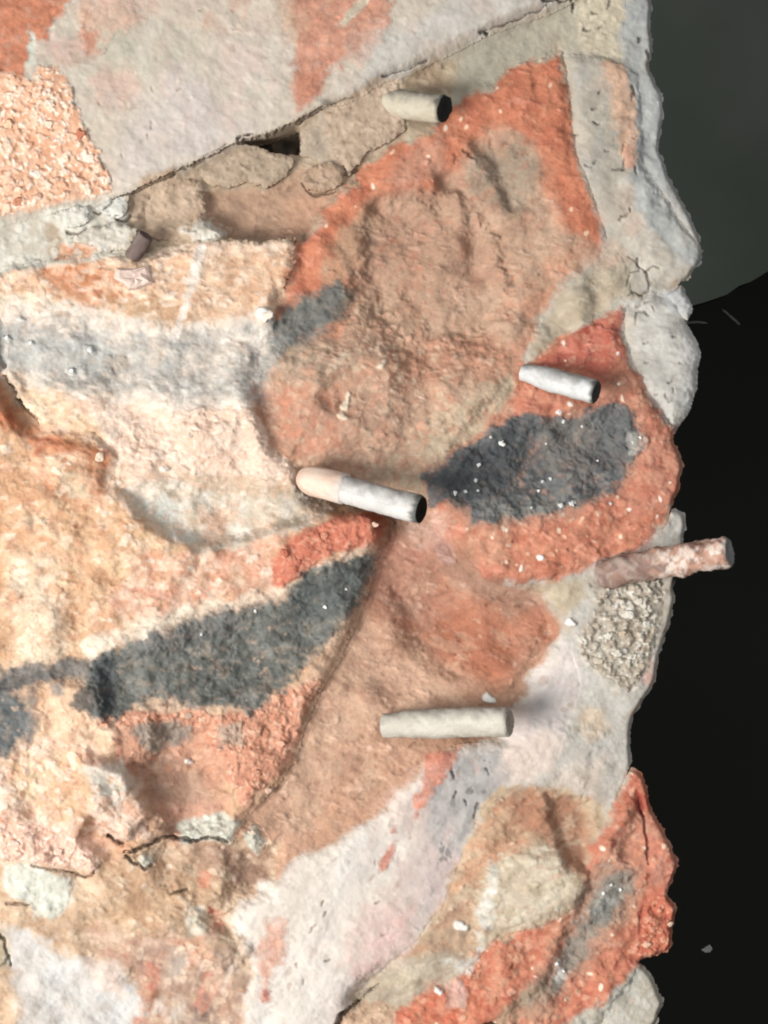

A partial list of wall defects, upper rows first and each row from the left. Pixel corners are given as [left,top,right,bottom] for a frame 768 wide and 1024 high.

crack [478,0,575,36]
crack [382,58,428,79]
crack [65,97,358,235]
crack [106,833,229,872]
crack [170,887,188,895]